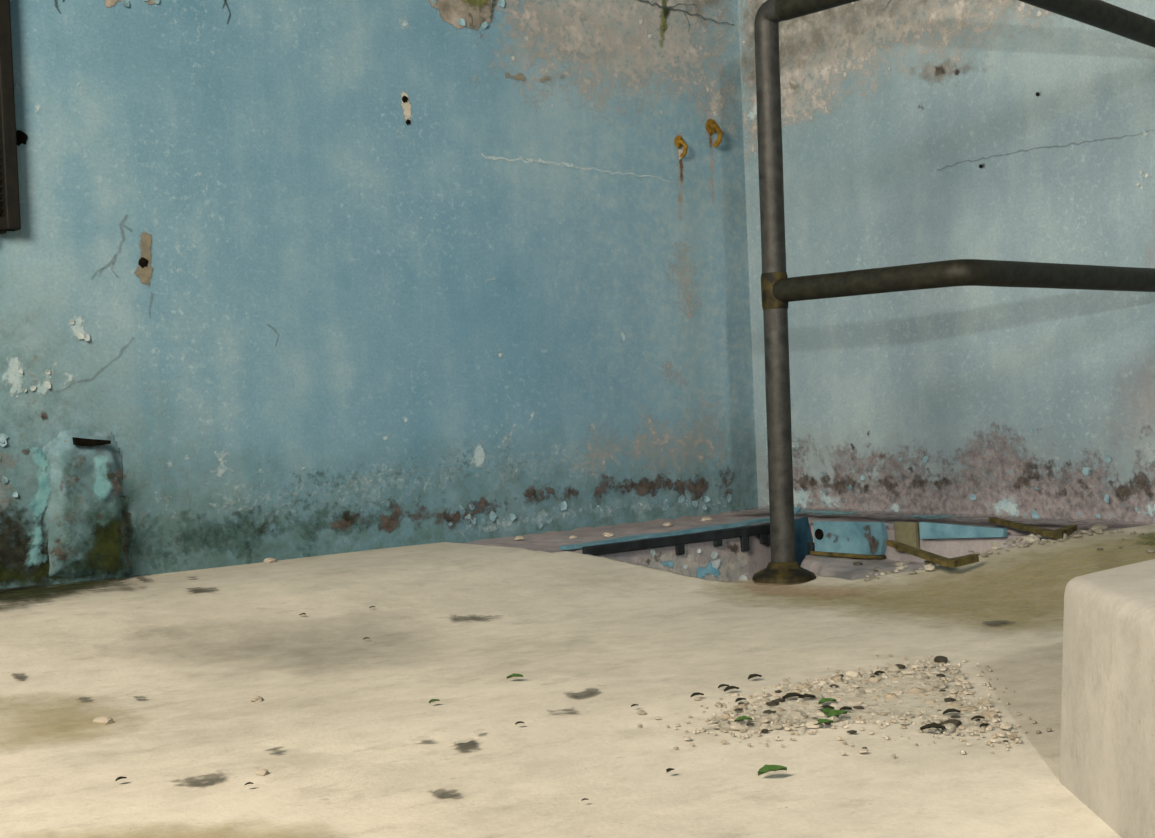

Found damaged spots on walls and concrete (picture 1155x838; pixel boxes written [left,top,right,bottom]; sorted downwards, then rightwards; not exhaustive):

peeling [429,0,734,121]
peeling [742,0,767,152]
peeling [779,0,1049,124]
leakage [0,508,151,609]
peeling [378,497,516,532]
peeling [515,486,579,529]
peeling [589,447,770,514]
peeling [792,423,1155,581]